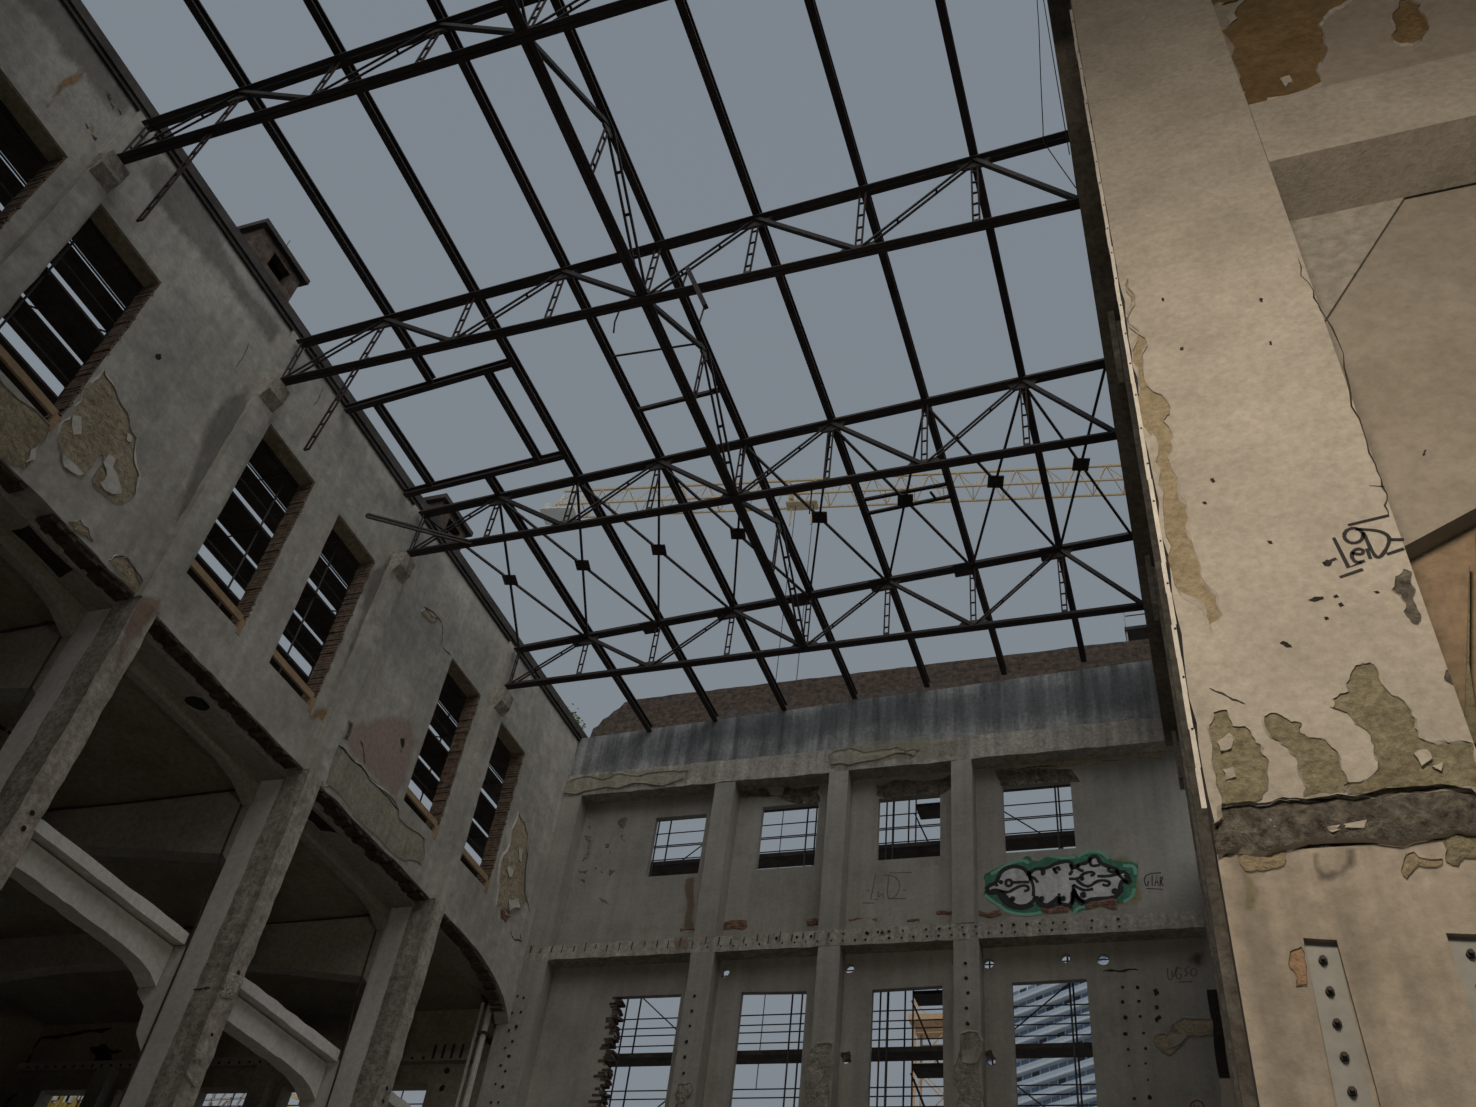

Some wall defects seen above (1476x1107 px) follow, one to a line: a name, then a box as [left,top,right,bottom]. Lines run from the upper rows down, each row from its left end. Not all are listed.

flaking render [1211,0,1353,105]
flaking render [1390,0,1429,47]
flaking render [0,368,141,506]
spalling [1125,278,1225,635]
damp [607,671,1139,756]
spalling [1207,566,1476,879]
flaking render [564,770,688,795]
spalling [315,789,427,901]
spalling [495,811,832,953]